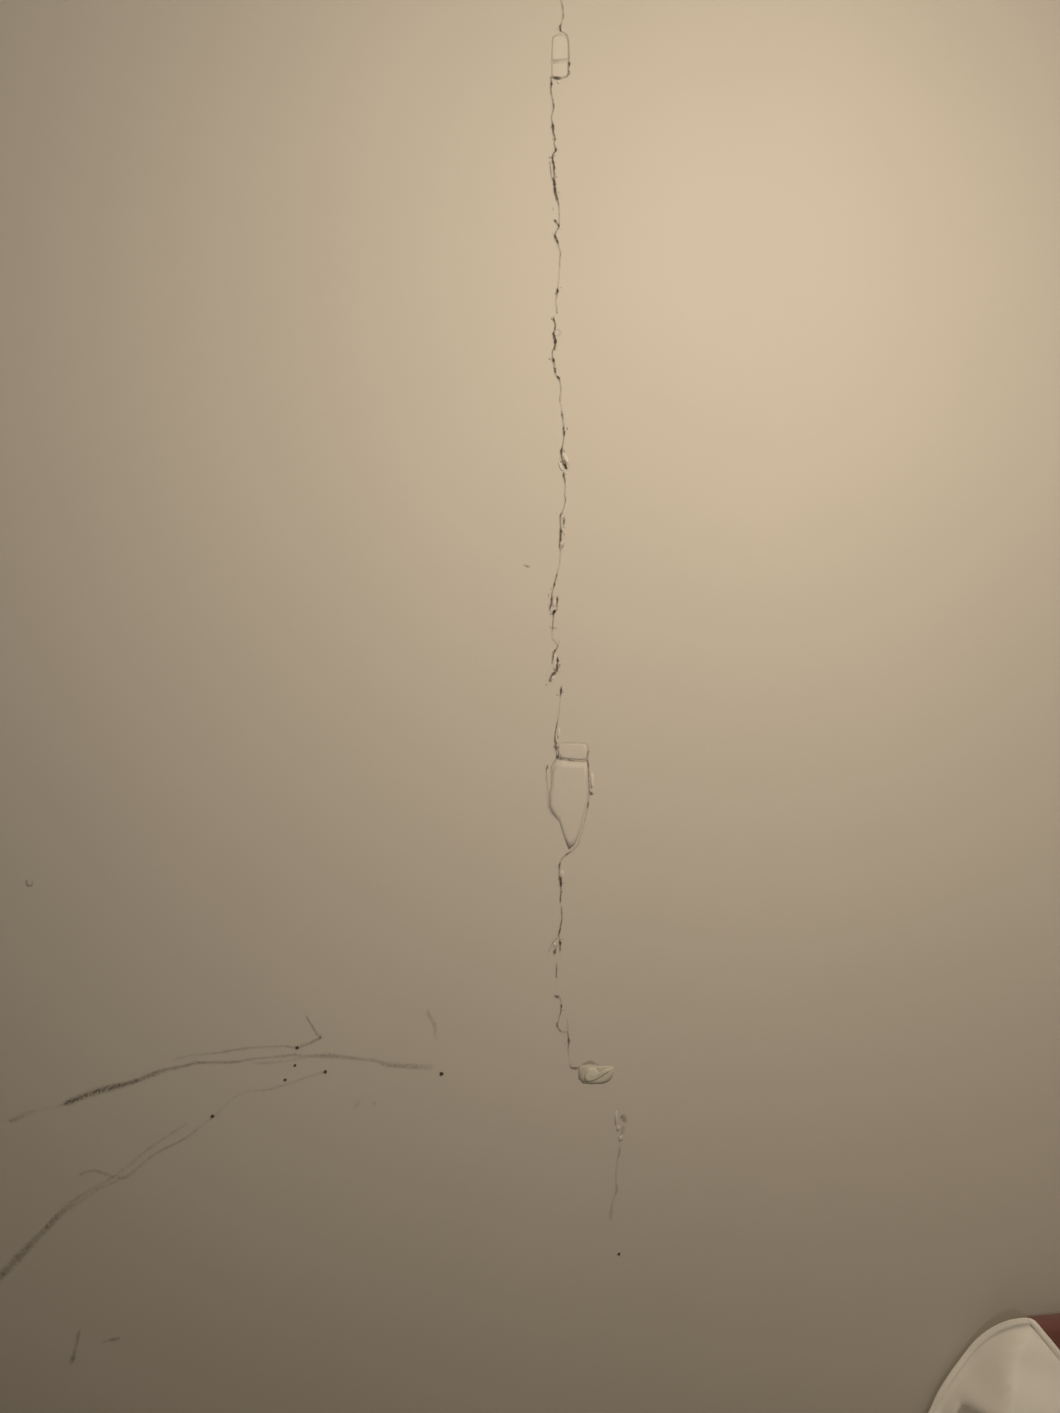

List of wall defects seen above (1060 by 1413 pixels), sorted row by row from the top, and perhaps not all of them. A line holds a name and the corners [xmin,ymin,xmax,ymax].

crack [549,24,570,243]
crack [549,287,562,379]
crack [558,414,570,479]
crack [548,513,565,614]
crack [546,650,594,806]
crack [553,852,570,953]